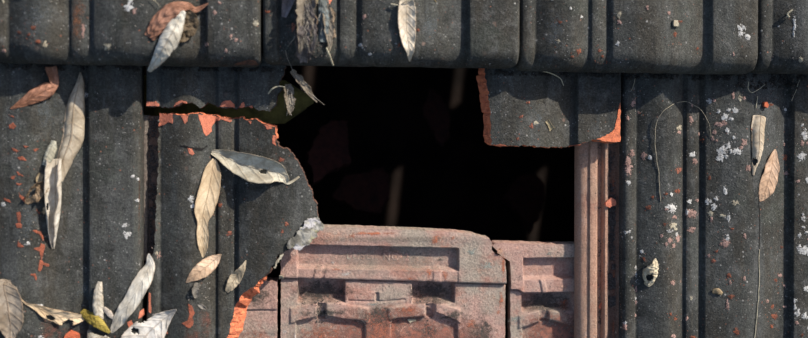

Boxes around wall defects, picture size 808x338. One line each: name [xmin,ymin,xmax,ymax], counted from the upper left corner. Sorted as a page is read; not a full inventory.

spalling [127,53,319,338]
spalling [476,46,621,149]